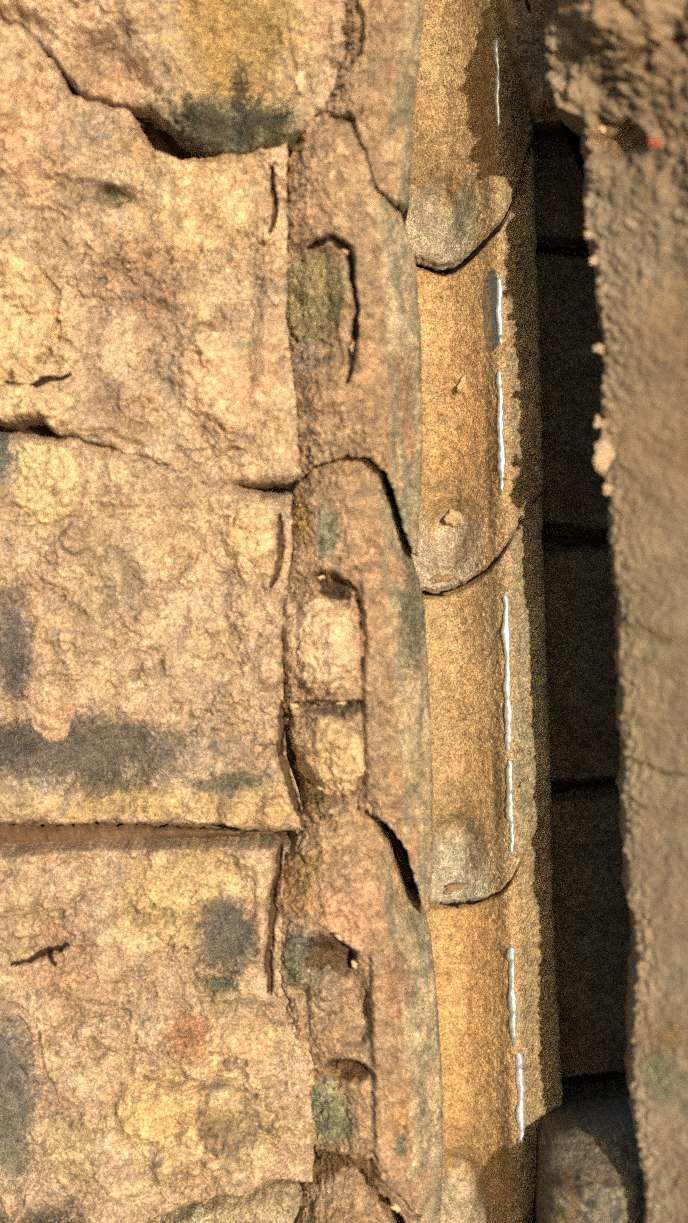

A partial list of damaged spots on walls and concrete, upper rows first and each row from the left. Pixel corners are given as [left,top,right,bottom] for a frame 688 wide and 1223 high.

crack [594,33,688,85]
crack [135,117,199,159]
water stain [181,93,203,140]
water stain [230,63,252,126]
water stain [267,109,291,147]
flaking render [583,230,599,266]
flaking render [591,343,606,355]
flaking render [593,414,615,496]